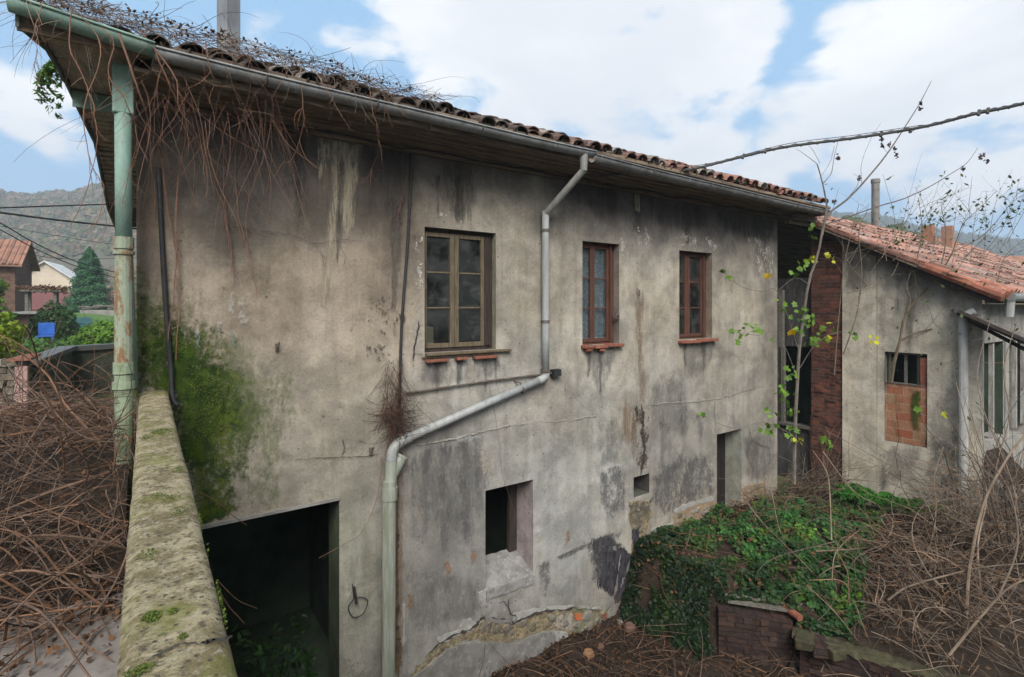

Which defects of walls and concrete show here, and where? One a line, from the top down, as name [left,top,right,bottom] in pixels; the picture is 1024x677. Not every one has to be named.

damp [318,139,359,306]
crack [408,416,594,446]
crack [635,382,773,473]
peeling [557,532,615,559]
damp [588,534,633,603]
spalling [628,496,716,553]
spalling [411,587,636,677]